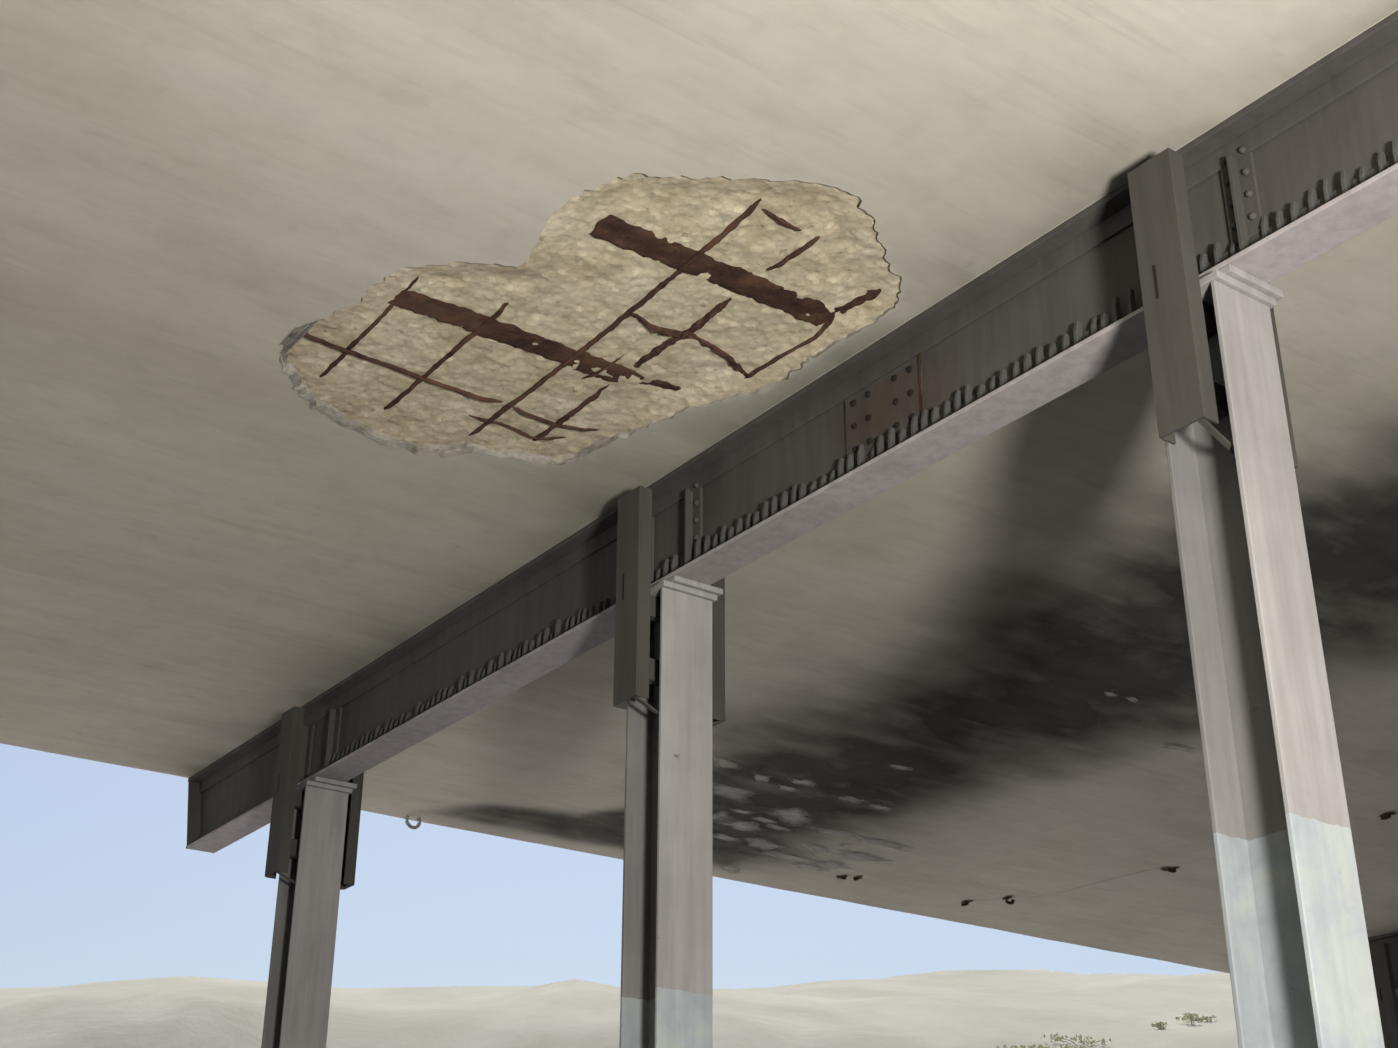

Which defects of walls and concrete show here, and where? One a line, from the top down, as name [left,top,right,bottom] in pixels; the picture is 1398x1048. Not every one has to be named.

spalling [279,173,902,465]